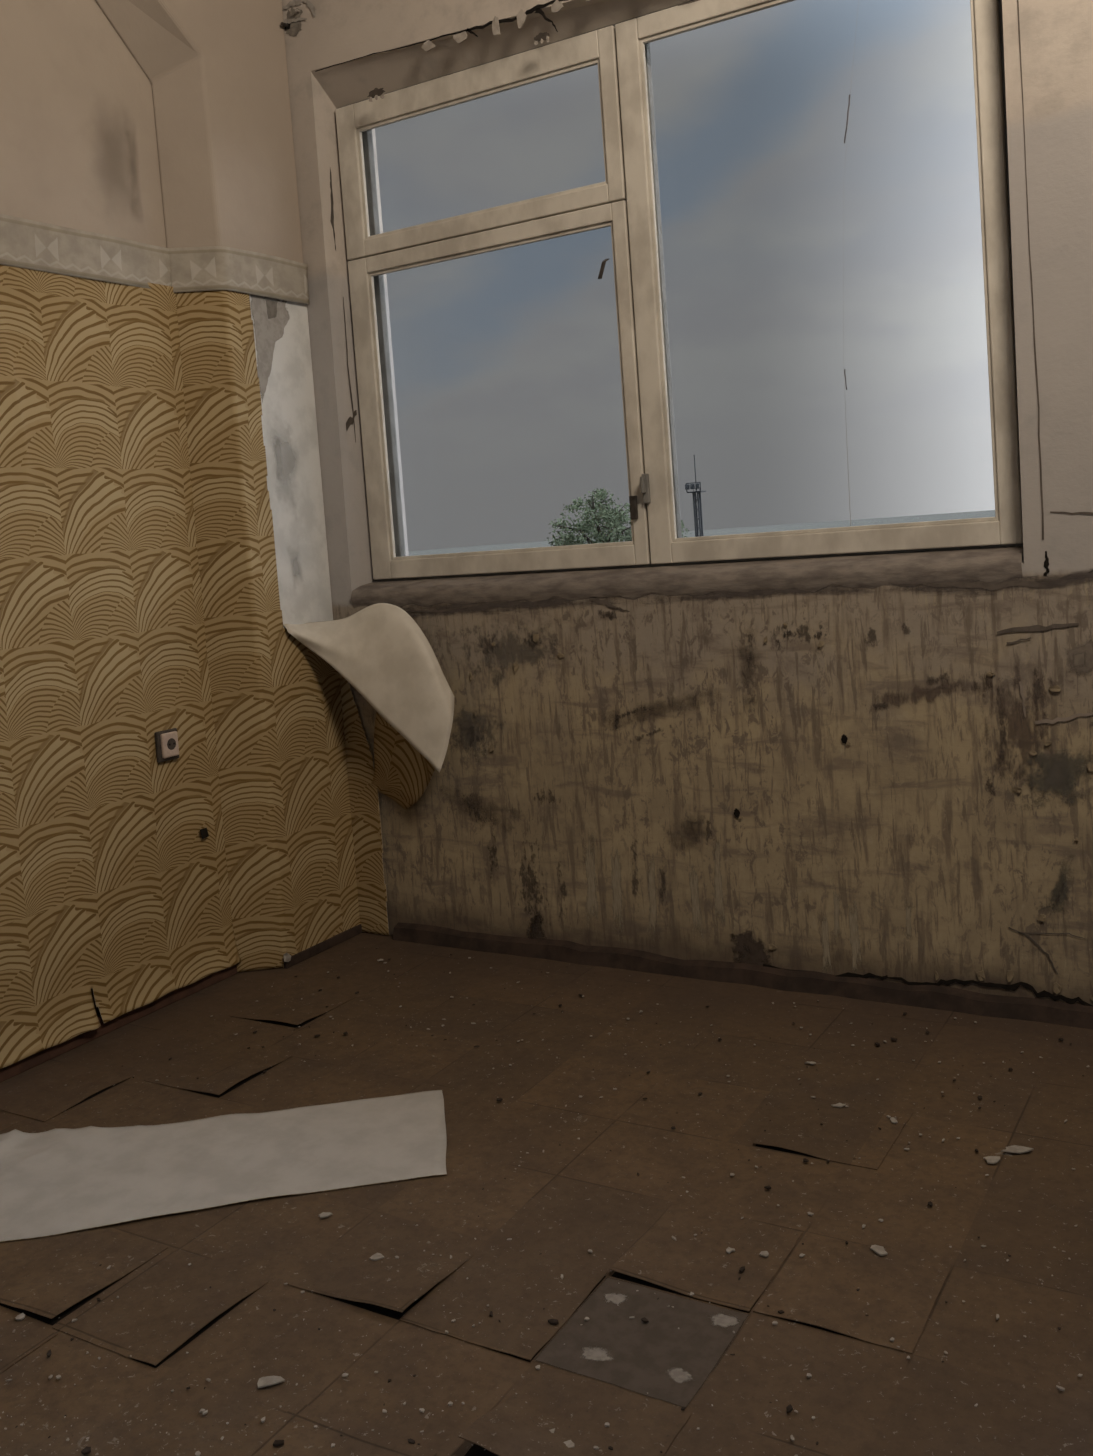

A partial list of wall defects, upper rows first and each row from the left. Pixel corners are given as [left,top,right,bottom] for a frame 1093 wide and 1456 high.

crack [315,0,593,72]
damp [515,846,567,930]
crack [1008,927,1085,974]
peeling [535,1277,749,1407]